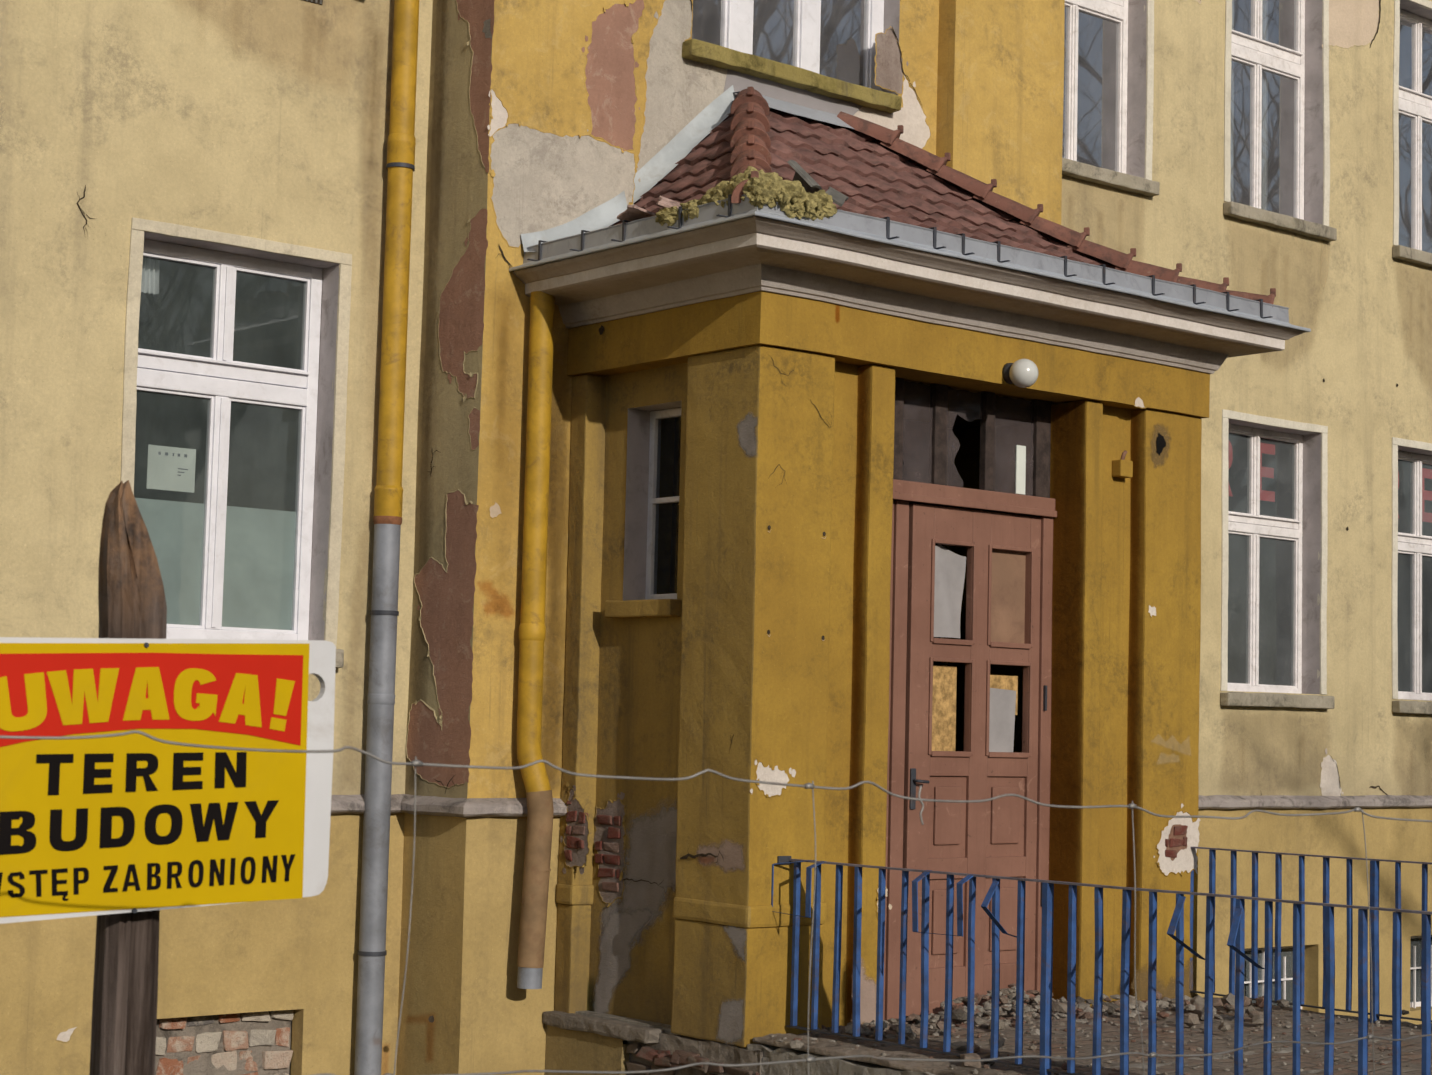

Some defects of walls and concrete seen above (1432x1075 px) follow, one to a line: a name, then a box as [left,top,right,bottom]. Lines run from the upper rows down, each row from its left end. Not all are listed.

flaking render [853,26,931,149]
crack [77,185,97,238]
flaking render [437,0,728,451]
peeling [406,489,502,789]
flaking render [750,758,796,798]
flaking render [560,782,677,1013]
flaking render [697,840,745,871]
flaking render [1154,804,1200,877]